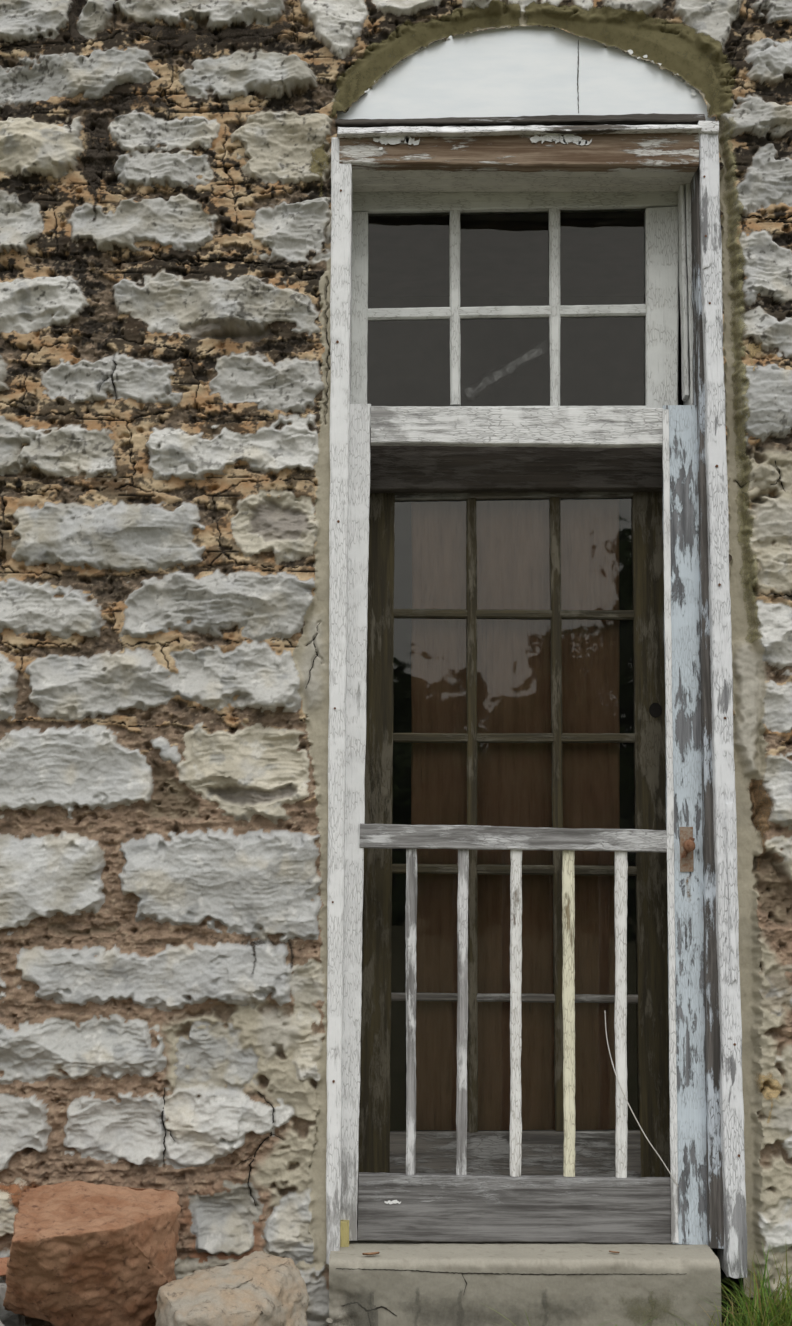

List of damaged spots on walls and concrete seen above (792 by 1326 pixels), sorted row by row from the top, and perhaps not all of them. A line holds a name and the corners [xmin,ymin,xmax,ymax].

peeling [373,136,420,150]
peeling [530,134,592,145]
crack [161,1088,175,1162]
crack [239,1091,283,1206]